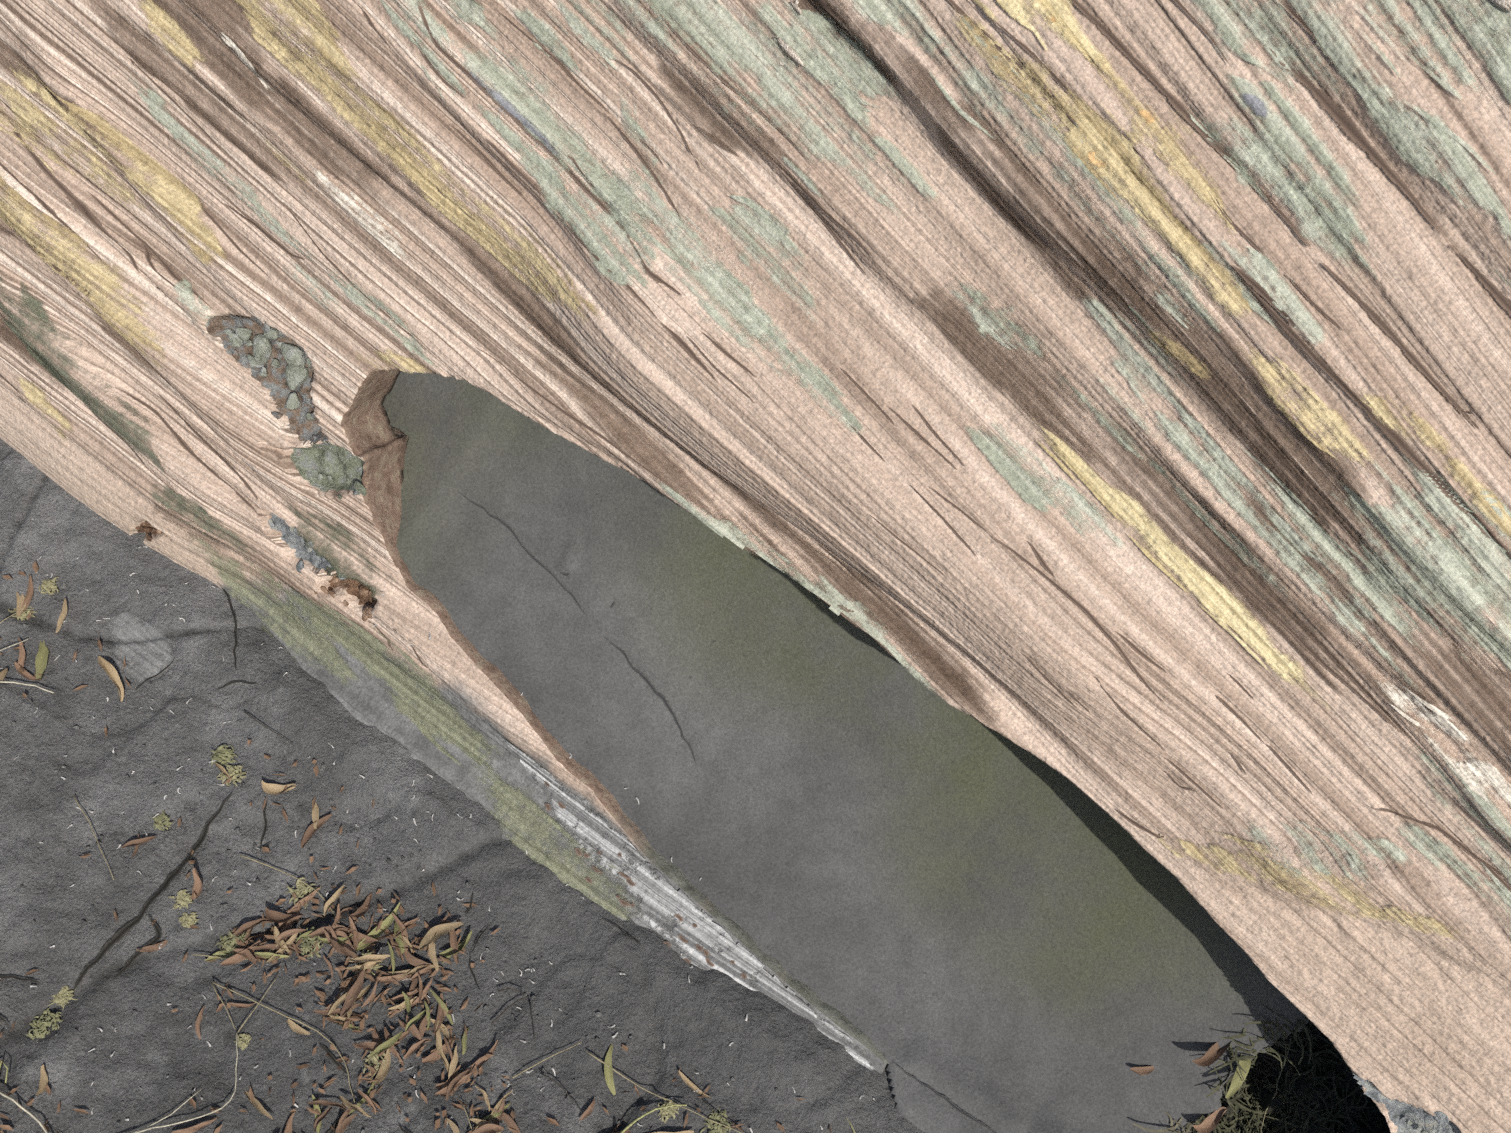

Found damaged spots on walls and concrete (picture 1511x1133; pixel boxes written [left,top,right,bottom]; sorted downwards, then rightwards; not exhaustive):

crack [0,974,38,982]
crack [72,793,272,995]